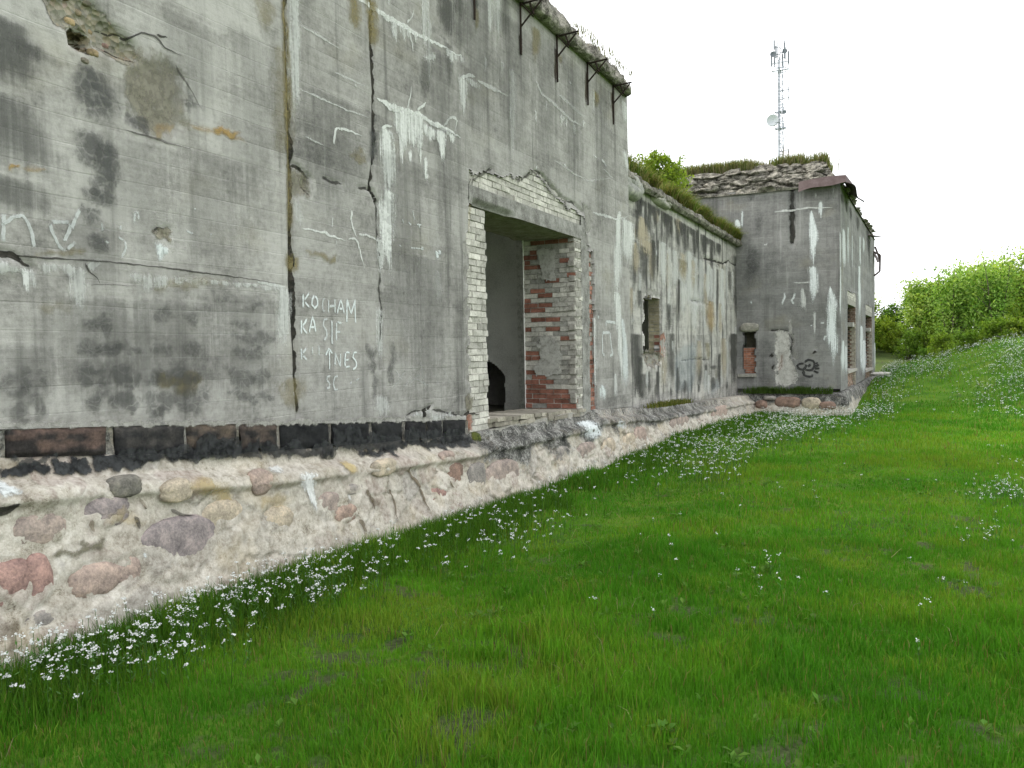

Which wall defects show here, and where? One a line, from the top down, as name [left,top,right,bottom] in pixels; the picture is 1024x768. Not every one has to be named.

damp [77,65,111,113]
spalling [43,0,183,138]
damp [80,133,118,220]
crack [18,0,382,412]
corrosion [215,127,237,139]
damp [377,73,480,269]
crack [776,185,832,243]
damp [593,197,737,398]
damp [801,189,870,370]
peeling [769,321,798,387]
efflorescence [860,326,875,371]